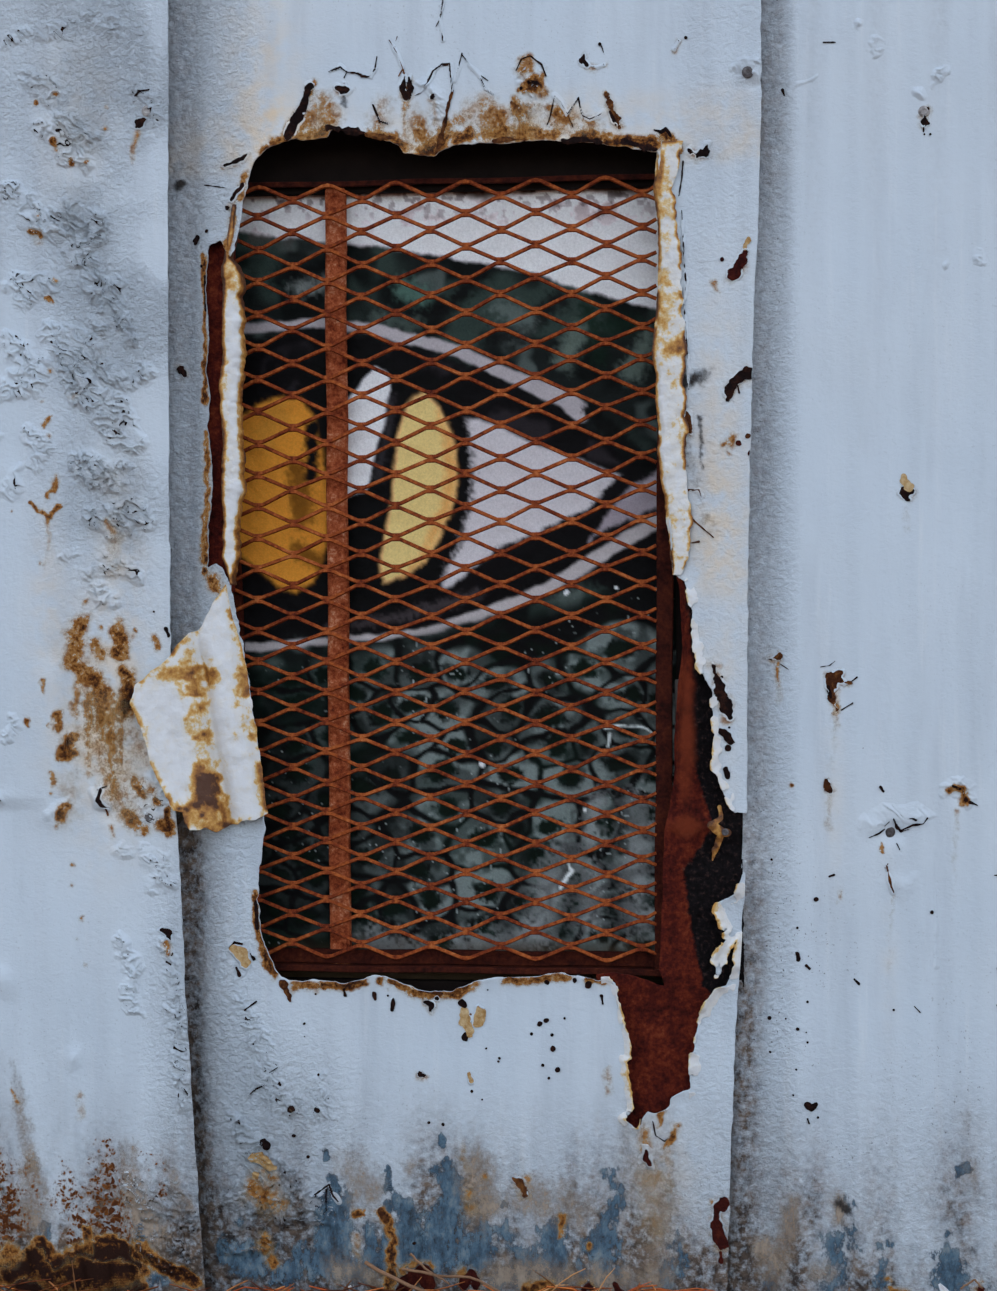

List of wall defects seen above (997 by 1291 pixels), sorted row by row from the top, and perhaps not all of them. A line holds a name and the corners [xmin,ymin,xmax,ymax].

corrosion [259,53,683,156]
peeling [204,150,252,256]
peeling [711,236,751,291]
peeling [721,366,752,402]
corrosion [46,599,176,838]
peeling [711,662,736,779]
corrosion [707,805,731,861]
peeling [458,989,488,1041]
peeling [530,1017,566,1080]
corrosion [0,1139,203,1291]
leakage [489,1169,667,1291]
leakage [835,1195,851,1223]